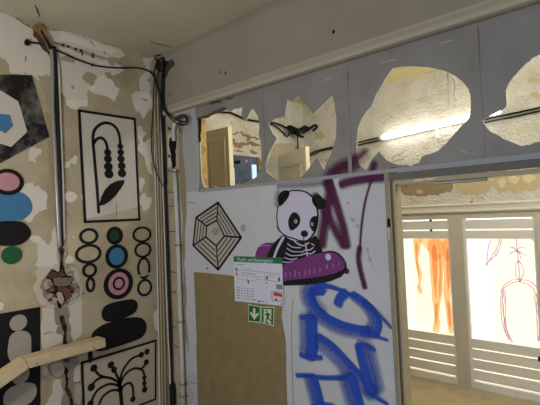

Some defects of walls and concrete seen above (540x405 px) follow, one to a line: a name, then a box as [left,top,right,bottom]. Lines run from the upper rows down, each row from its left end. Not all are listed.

peeling [31,23,118,66]
peeling [66,99,88,110]
peeling [82,72,121,101]
peeling [135,92,153,117]
peeling [197,98,232,143]
peeling [232,123,261,174]
peeling [454,167,540,203]
spalling [33,246,83,309]